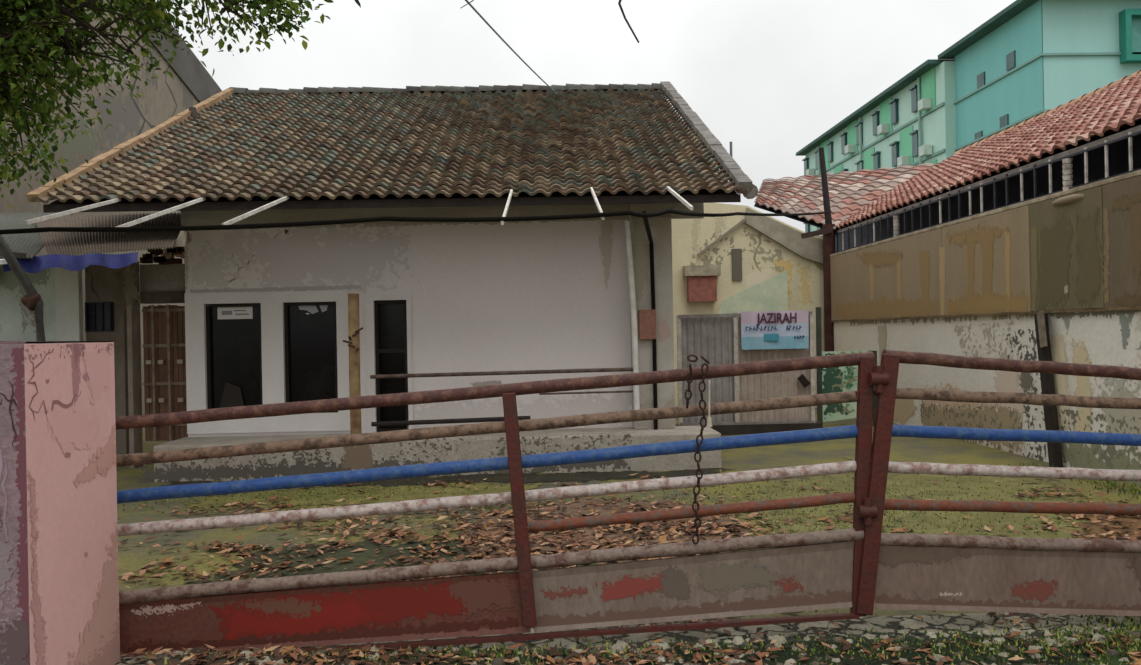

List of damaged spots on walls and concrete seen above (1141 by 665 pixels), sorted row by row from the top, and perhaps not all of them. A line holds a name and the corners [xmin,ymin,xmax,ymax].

crack [0,352,81,452]
spalling [1099,385,1141,434]